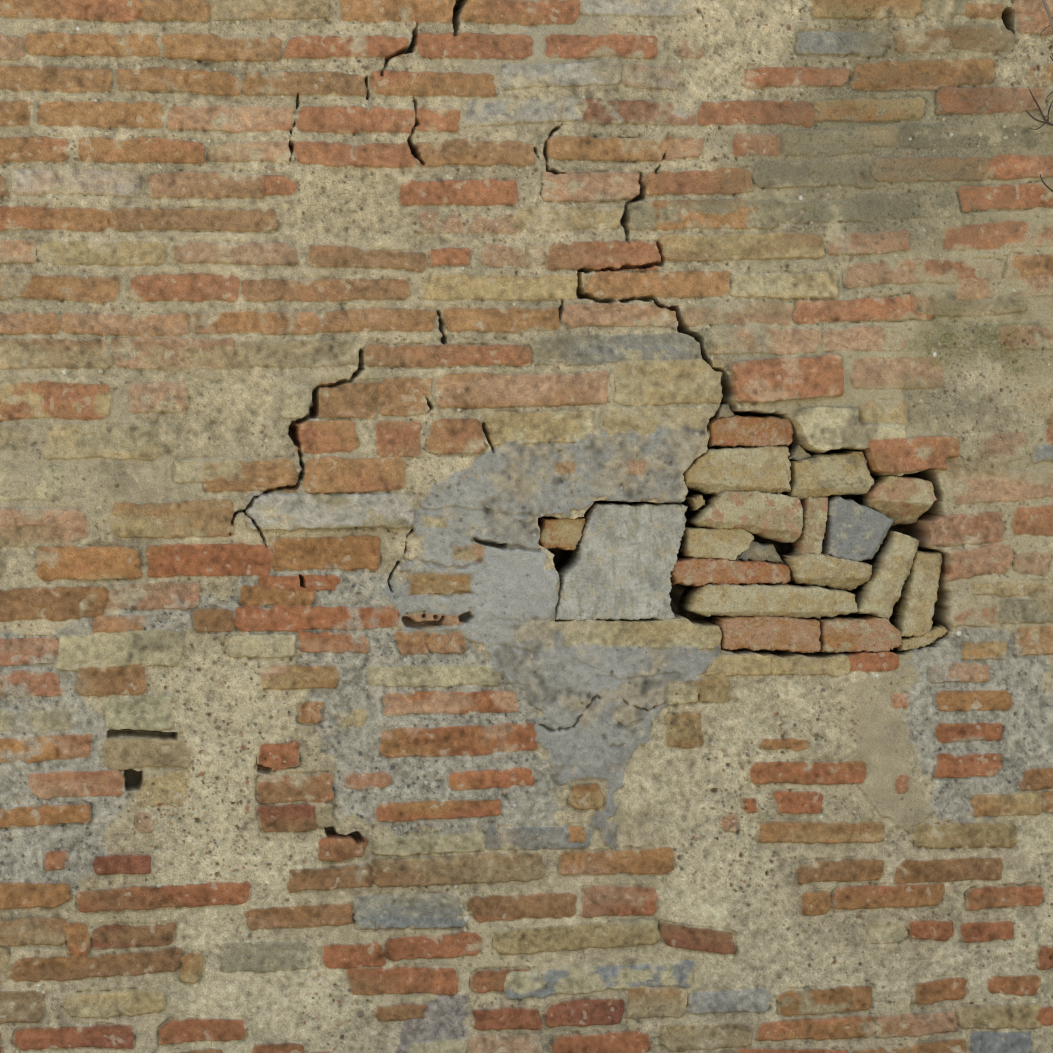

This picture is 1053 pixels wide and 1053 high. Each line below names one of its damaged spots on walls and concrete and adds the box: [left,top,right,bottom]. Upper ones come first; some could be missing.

crack [452,0,468,36]
crack [364,23,419,100]
crack [407,95,426,165]
crack [533,123,572,175]
crack [558,150,738,447]
crack [228,348,365,548]
spalling [720,399,883,477]
spalling [474,538,508,549]
spalling [539,545,566,566]
spalling [721,468,953,659]
spalling [401,616,444,630]
spalling [669,584,718,626]